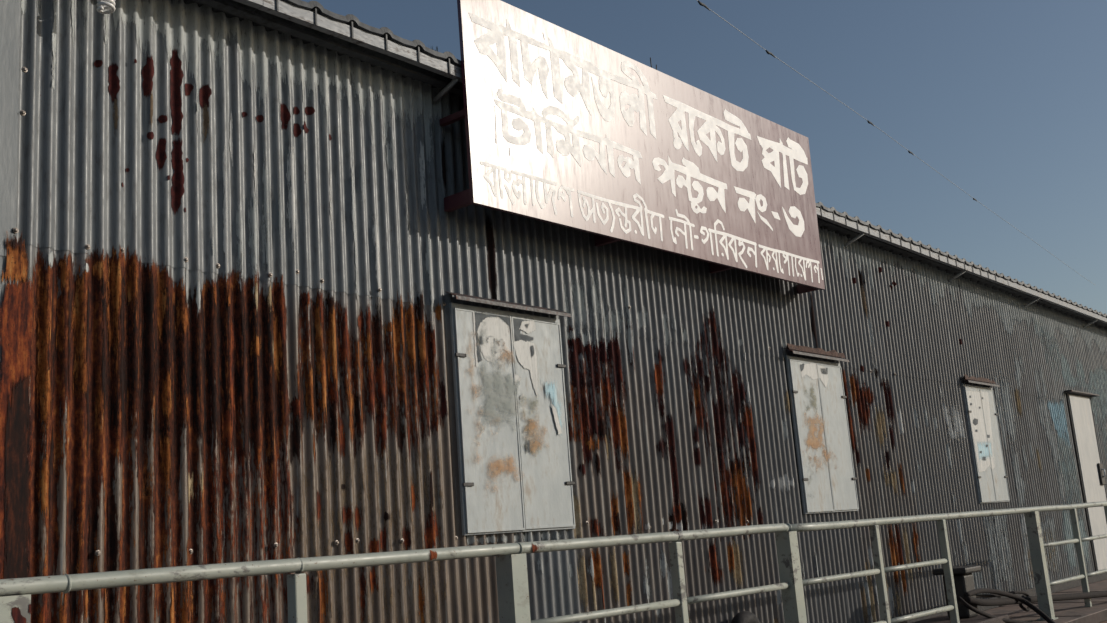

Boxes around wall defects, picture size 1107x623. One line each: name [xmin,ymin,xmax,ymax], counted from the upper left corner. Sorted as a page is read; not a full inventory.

corrosion [94,60,120,129]
corrosion [134,49,212,214]
corrosion [280,103,315,137]
corrosion [0,232,449,623]
corrosion [568,305,643,611]
corrosion [650,308,763,587]
corrosion [786,270,915,497]
corrosion [885,523,921,616]
peeling [818,227,1107,599]